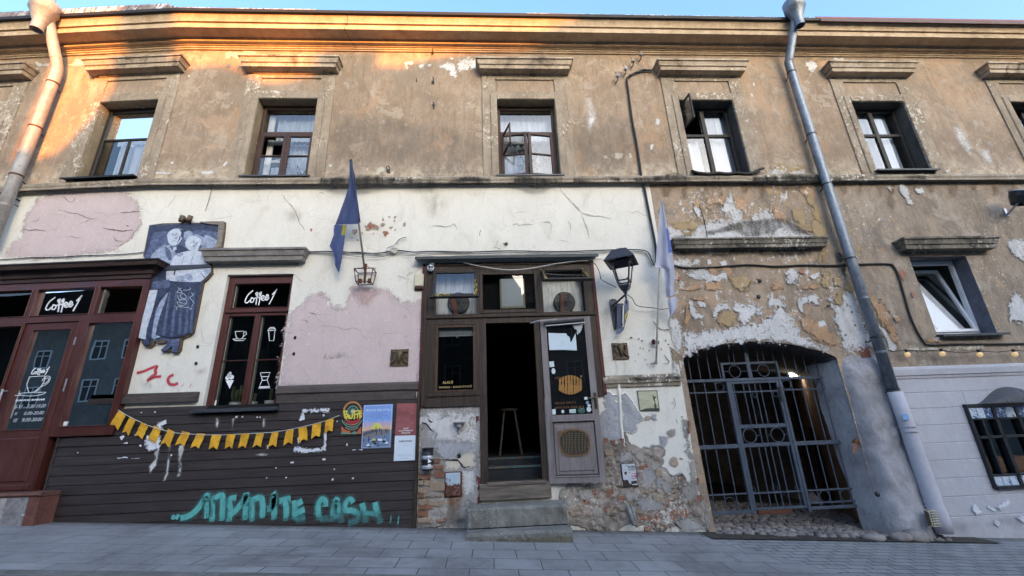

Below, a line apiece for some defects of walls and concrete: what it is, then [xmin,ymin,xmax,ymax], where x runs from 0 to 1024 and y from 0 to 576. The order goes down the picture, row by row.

peeling [404,55,483,78]
crack [58,196,139,241]
peeling [351,216,406,241]
crack [513,185,649,243]
peeling [630,161,986,374]
peeling [1005,290,1024,326]
spalling [417,449,481,528]
spalling [558,391,709,532]